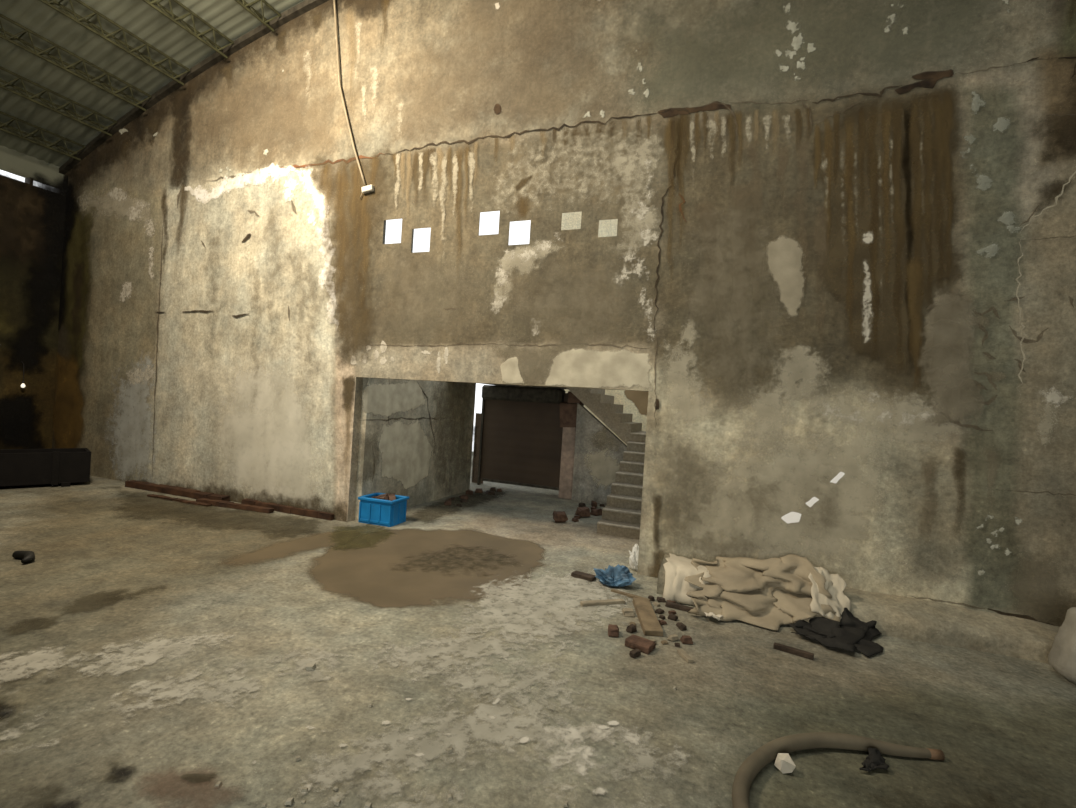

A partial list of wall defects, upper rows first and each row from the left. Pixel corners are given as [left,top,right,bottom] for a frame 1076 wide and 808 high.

leakage [66,0,389,188]
leakage [185,163,339,328]
corrosion [314,145,476,364]
leakage [351,255,466,365]
crack [208,108,690,427]
leakage [491,133,661,385]
corrosion [665,112,741,206]
flaking render [767,236,804,316]
corrosion [796,90,961,373]
leakage [221,371,320,508]